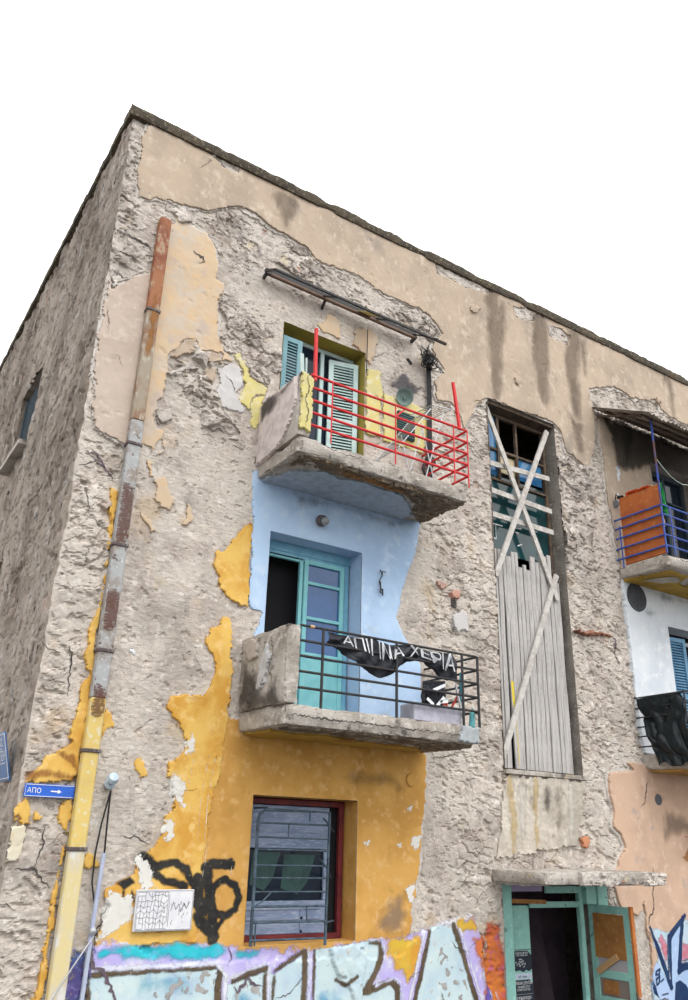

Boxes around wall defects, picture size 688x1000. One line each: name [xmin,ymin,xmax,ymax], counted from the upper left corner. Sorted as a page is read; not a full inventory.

rust [146,302,158,355]
spalling [108,119,441,455]
spalling [556,455,597,580]
peeling [212,523,253,607]
peeling [623,570,688,599]
peeling [25,487,118,784]
spalling [573,629,612,637]
peeling [13,798,42,825]
peeling [94,617,234,947]
peeling [397,835,423,851]
leakage [508,776,549,853]
peeling [30,799,72,1000]